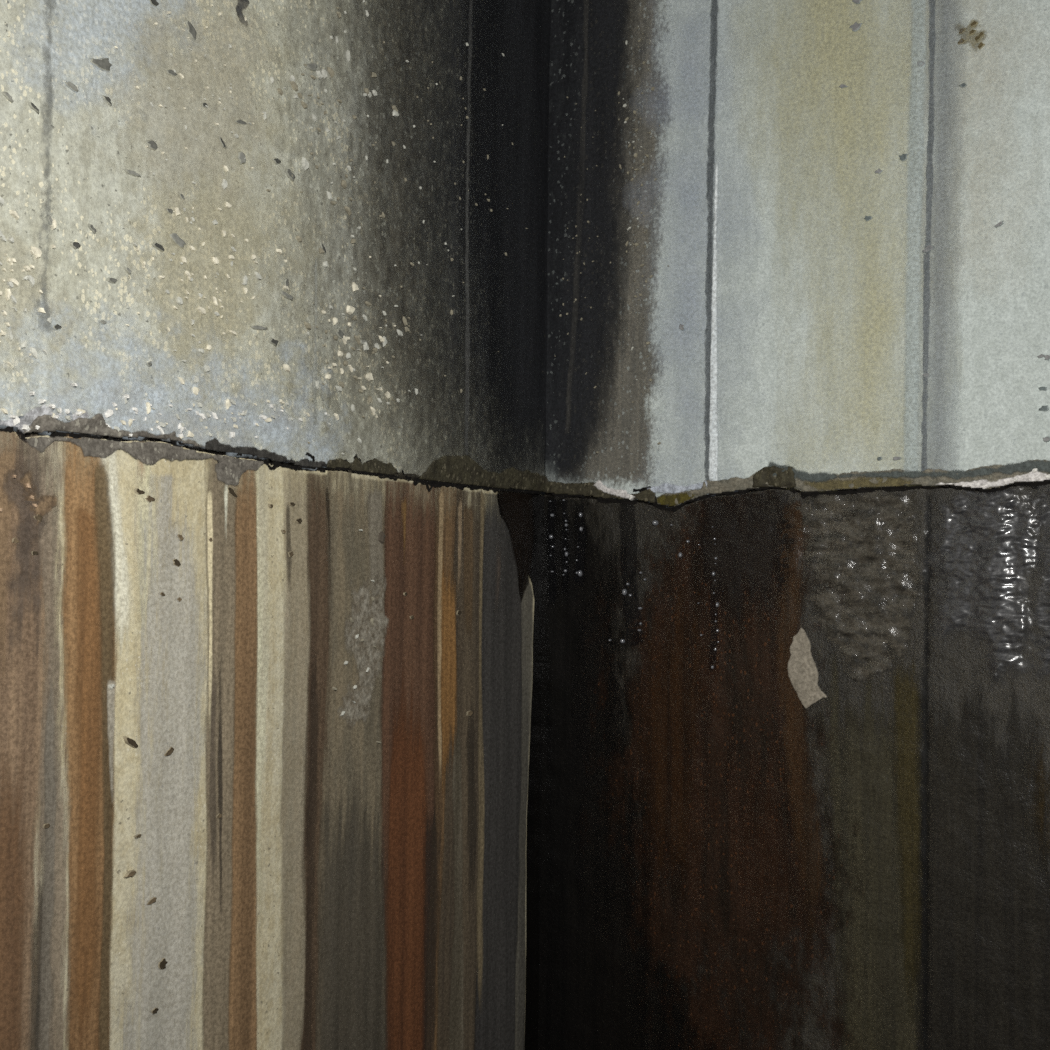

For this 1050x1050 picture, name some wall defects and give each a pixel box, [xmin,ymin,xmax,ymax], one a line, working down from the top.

rust [0,431,49,1050]
rust [63,437,116,1050]
rust [229,470,257,1050]
rust [301,474,331,1050]
rust [381,481,485,1050]
crack [0,411,1050,512]
water stain [347,0,707,500]
water stain [474,491,726,1050]
rust [611,497,843,1050]
water stain [701,491,794,624]
peeling [788,628,827,708]
water stain [822,666,1050,1050]